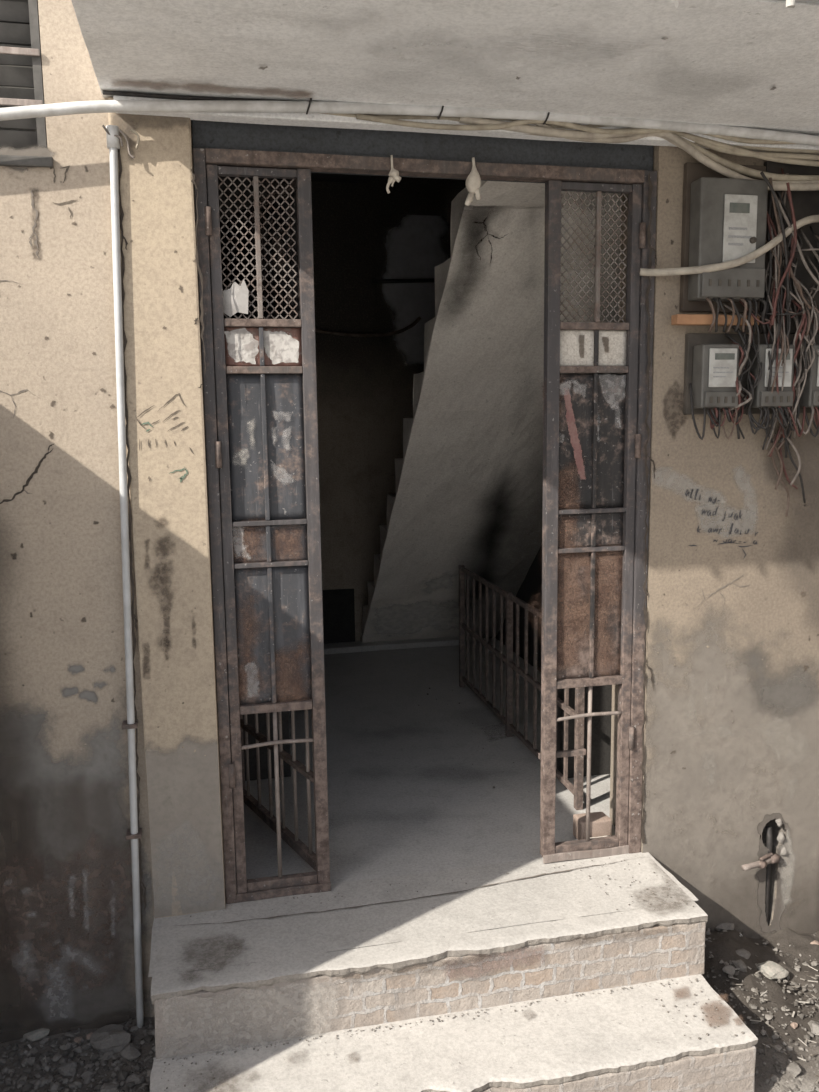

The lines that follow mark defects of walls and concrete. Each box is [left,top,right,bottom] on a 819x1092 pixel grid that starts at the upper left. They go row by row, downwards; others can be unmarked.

crack [0,389,39,417]
crack [0,444,54,504]
water stain [0,699,135,1044]
peeling [62,666,115,702]
peeling [6,698,225,1025]
peeling [643,618,819,939]